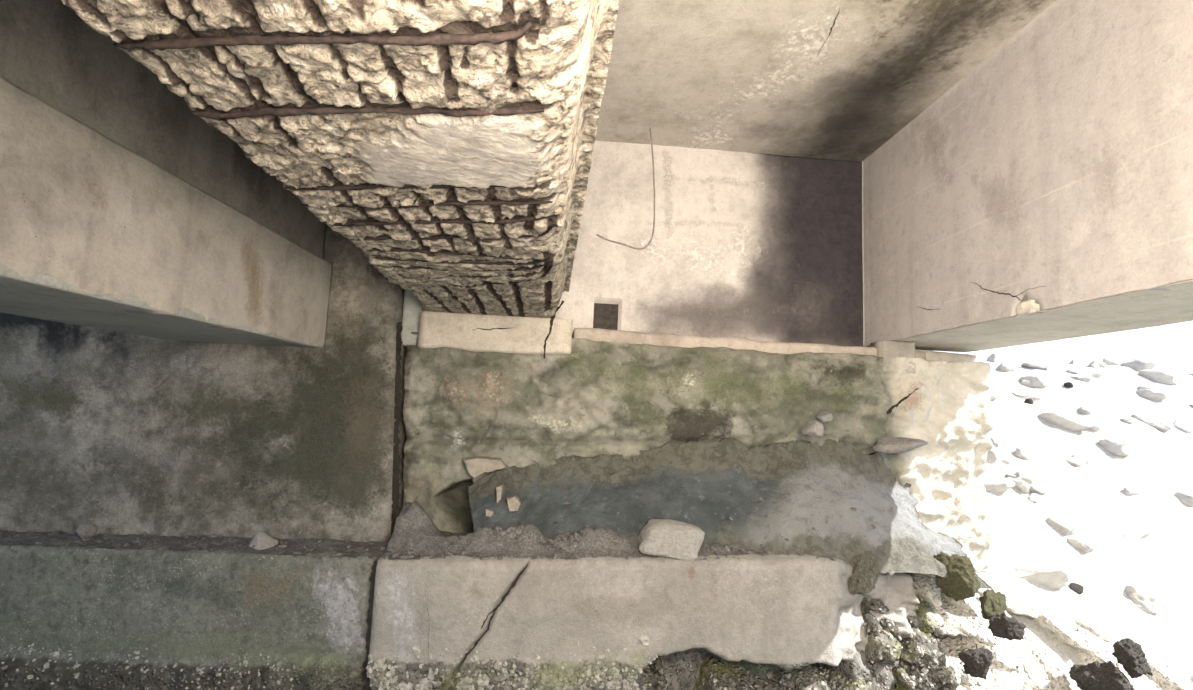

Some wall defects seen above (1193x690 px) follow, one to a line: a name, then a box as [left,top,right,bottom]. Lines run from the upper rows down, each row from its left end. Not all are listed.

spalling [61,0,619,318]
water stain [640,0,1005,347]
corrosion [331,237,376,321]
water stain [0,312,132,380]
crack [543,300,564,359]
water stain [819,365,864,385]
efflorescence [532,416,577,434]
water stain [667,404,734,442]
crack [426,565,528,690]